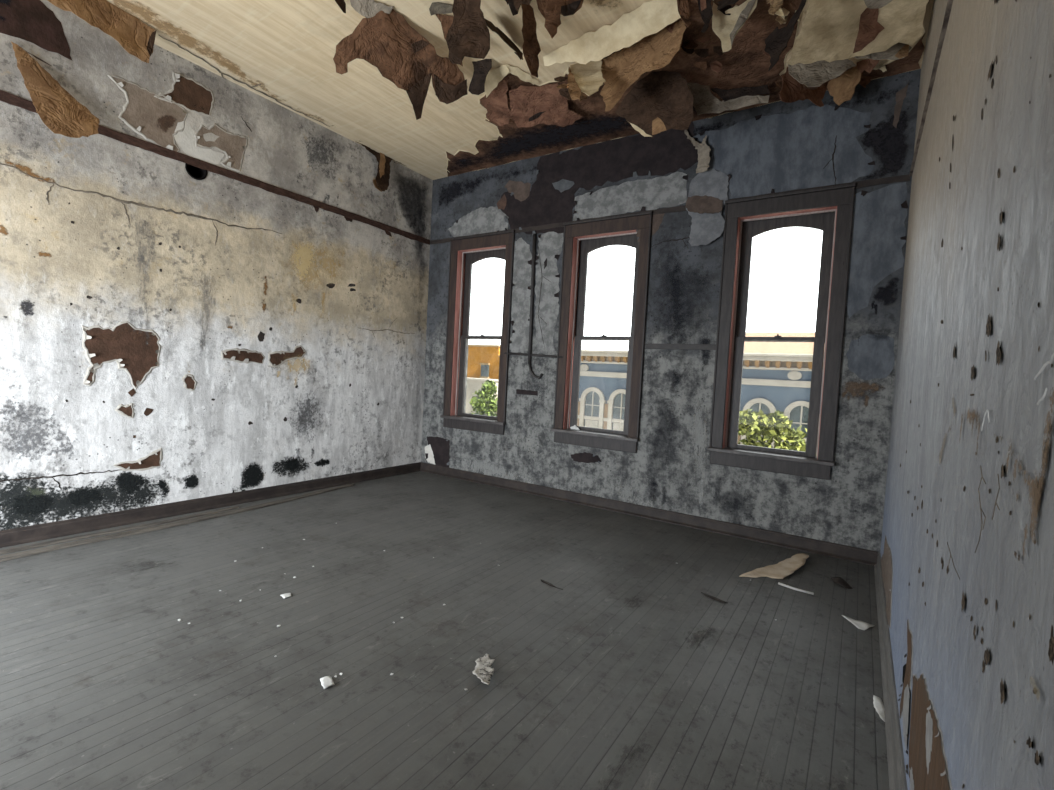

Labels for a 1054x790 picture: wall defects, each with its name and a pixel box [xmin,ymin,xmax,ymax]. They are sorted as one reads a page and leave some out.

peeling [0,0,156,138]
peeling [107,71,248,172]
crack [0,163,282,246]
peeling [333,0,926,354]
peeling [82,321,161,418]
peeling [221,327,307,367]
leakage [0,400,170,531]
leakage [183,475,198,489]
leakage [466,457,533,484]
leakage [690,398,709,509]
spalling [961,590,990,672]
peeling [898,619,965,790]